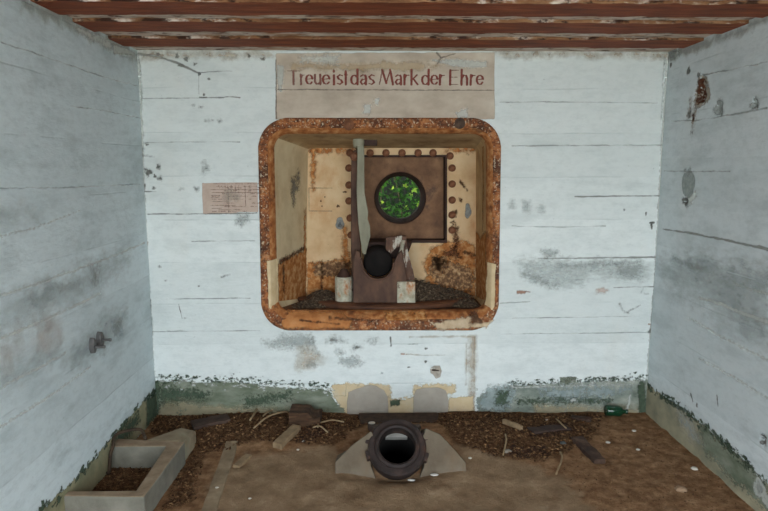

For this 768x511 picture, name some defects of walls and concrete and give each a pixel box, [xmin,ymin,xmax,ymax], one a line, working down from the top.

spalling [687,68,723,124]
rust [309,148,353,191]
spalling [682,171,695,206]
rust [278,215,351,301]
rust [424,224,486,300]
rust [281,311,373,330]
peeling [39,316,768,511]